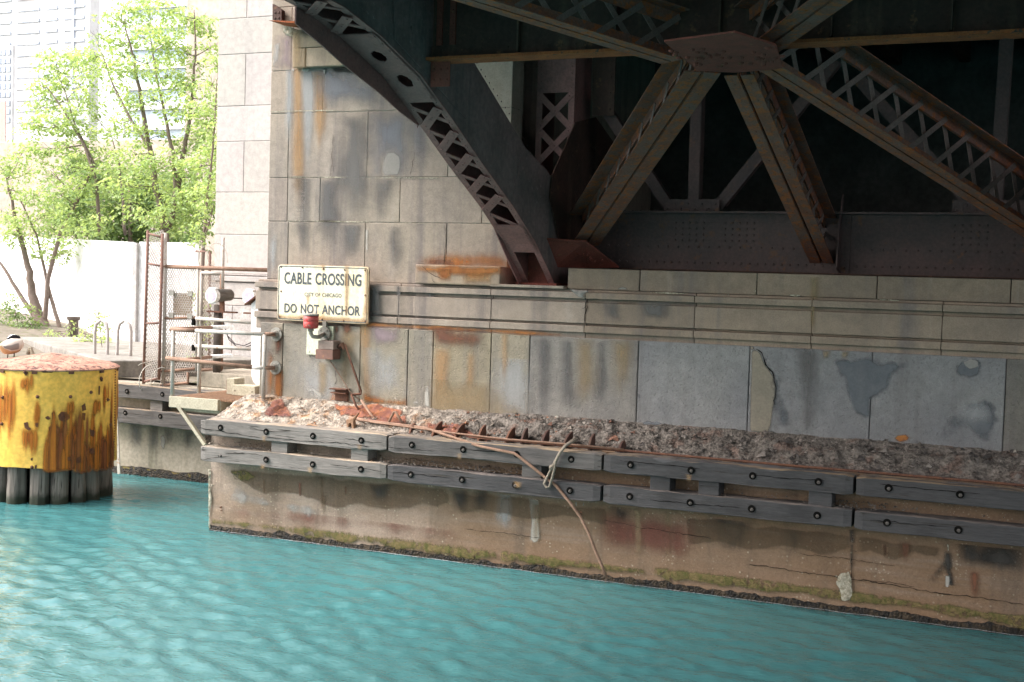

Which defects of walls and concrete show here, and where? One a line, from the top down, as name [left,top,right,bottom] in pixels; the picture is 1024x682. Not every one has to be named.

corrosion [294,70,302,176]
corrosion [315,74,323,133]
corrosion [421,257,503,280]
corrosion [0,372,119,473]
corrosion [321,365,406,423]
corrosion [413,326,478,390]
spalling [218,347,1024,487]
damp [836,359,899,416]